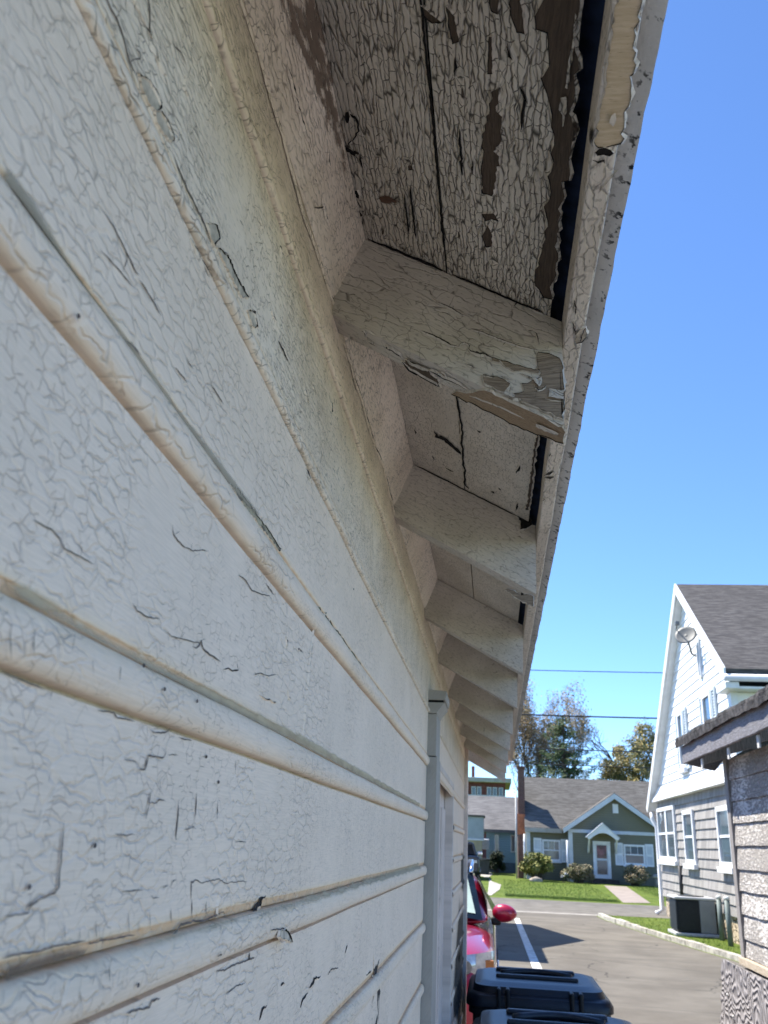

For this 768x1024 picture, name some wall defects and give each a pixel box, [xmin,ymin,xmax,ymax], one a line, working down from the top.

peeling [281,0,346,175]
crack [367,0,544,344]
peeling [481,211,500,248]
peeling [479,86,506,196]
peeling [489,0,584,300]
peeling [591,0,646,149]
crack [416,331,514,515]
peeling [401,352,567,510]
crack [133,604,291,704]
crack [1,878,266,959]
crack [259,945,348,1020]
crack [366,949,380,1024]